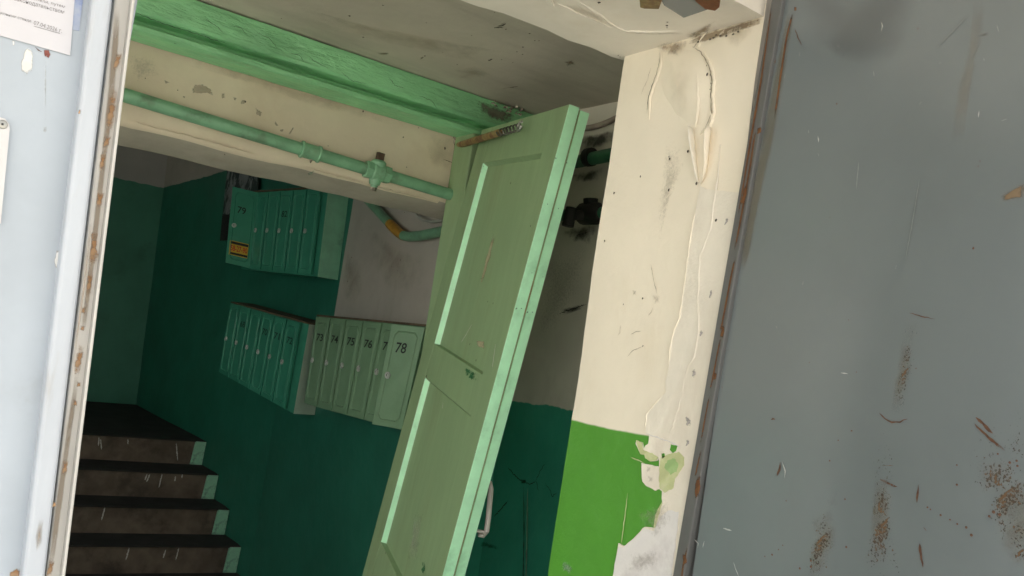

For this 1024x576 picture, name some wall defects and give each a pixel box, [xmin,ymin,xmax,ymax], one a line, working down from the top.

corrosion [77,32,121,334]
peeling [183,85,244,104]
corrosion [735,7,796,244]
peeling [613,111,739,576]
corrosion [701,261,735,437]
corrosion [52,401,77,544]
corrosion [799,514,833,571]
corrosion [867,479,899,573]
corrosion [976,425,1024,559]